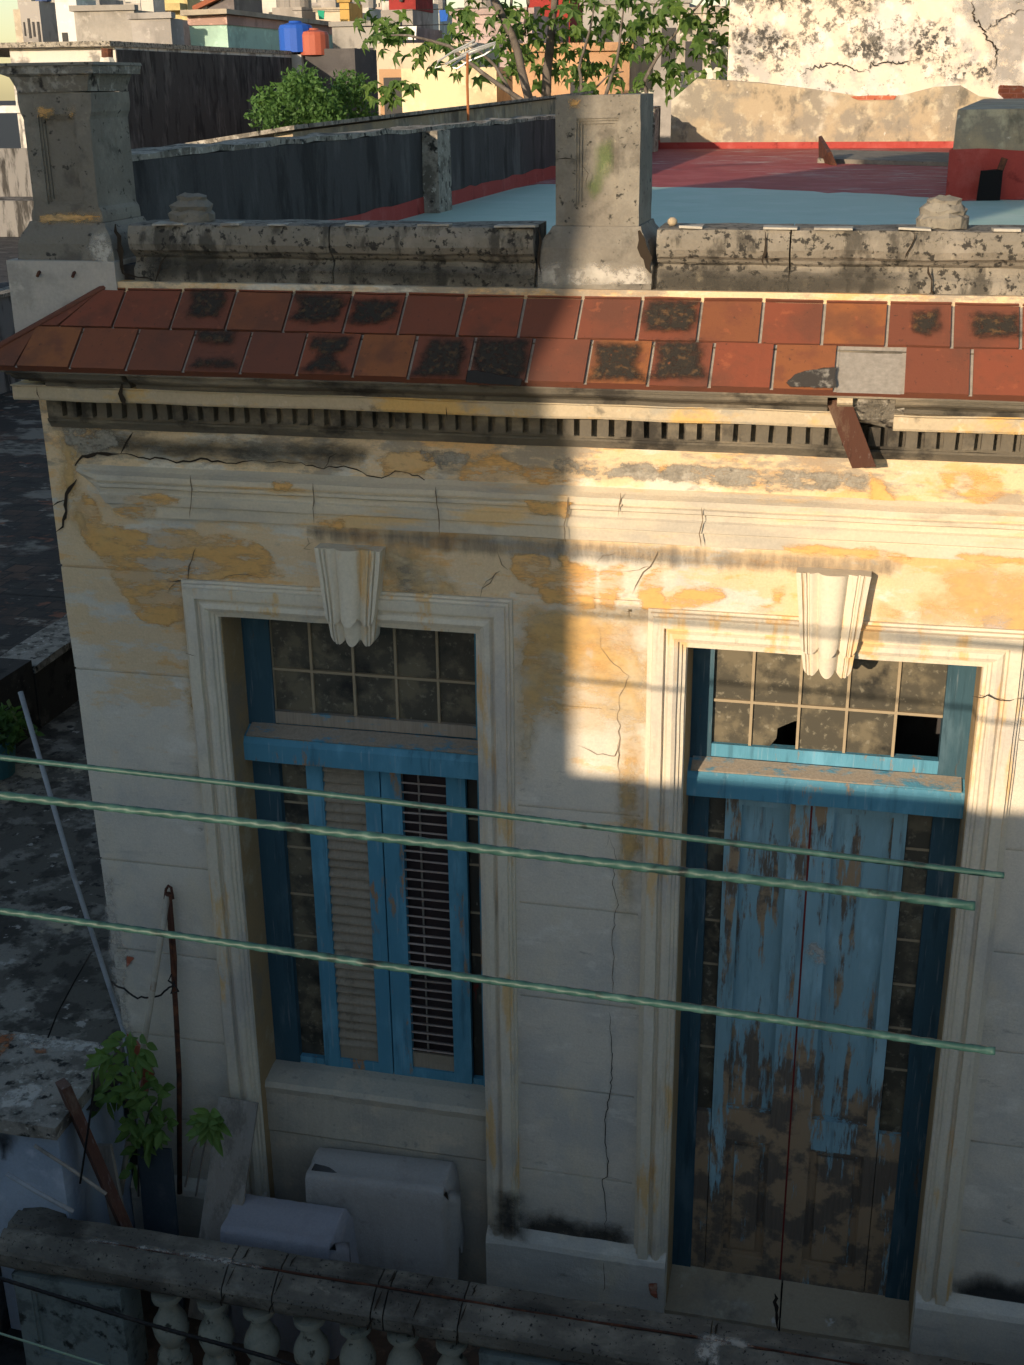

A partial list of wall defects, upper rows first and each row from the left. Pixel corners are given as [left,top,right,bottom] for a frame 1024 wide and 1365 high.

water stain [733,26,794,62]
water stain [843,33,888,60]
water stain [912,22,993,80]
flaking render [64,427,118,455]
peeling [79,493,281,627]
crack [583,633,629,781]
peeling [510,554,725,749]
crack [602,838,619,1291]